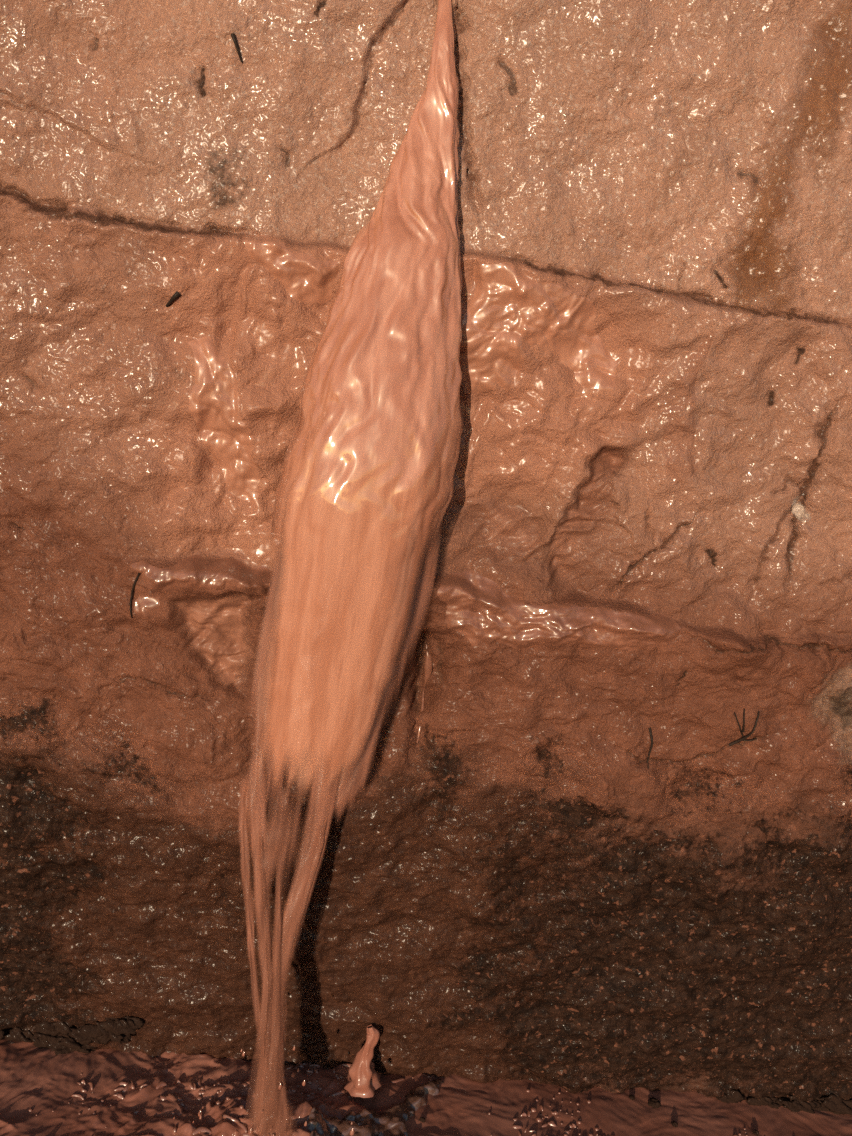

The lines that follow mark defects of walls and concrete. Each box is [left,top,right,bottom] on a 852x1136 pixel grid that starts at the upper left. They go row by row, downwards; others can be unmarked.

crack [454,16,476,181]
crack [0,184,230,235]
crack [510,258,838,323]
crack [611,516,691,590]
crack [755,412,832,580]
leakage [830,688,852,730]
leakage [0,698,305,1061]
leakage [283,728,852,1102]